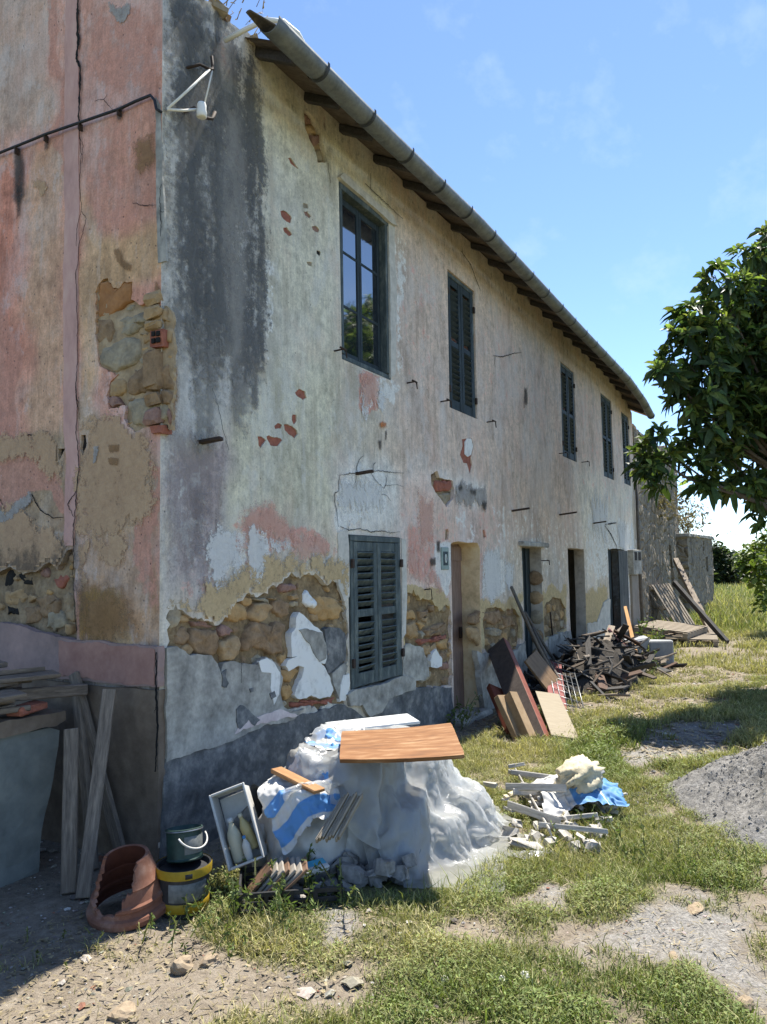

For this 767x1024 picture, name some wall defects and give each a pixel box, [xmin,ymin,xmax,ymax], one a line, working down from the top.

crack [0,0,115,631]
water stain [134,0,271,453]
spalling [304,113,324,163]
spalling [0,248,177,639]
spalling [166,522,350,734]
spalling [258,415,296,447]
crack [334,456,403,533]
spalling [404,438,487,688]
spalling [466,535,518,653]
spalling [544,597,564,637]